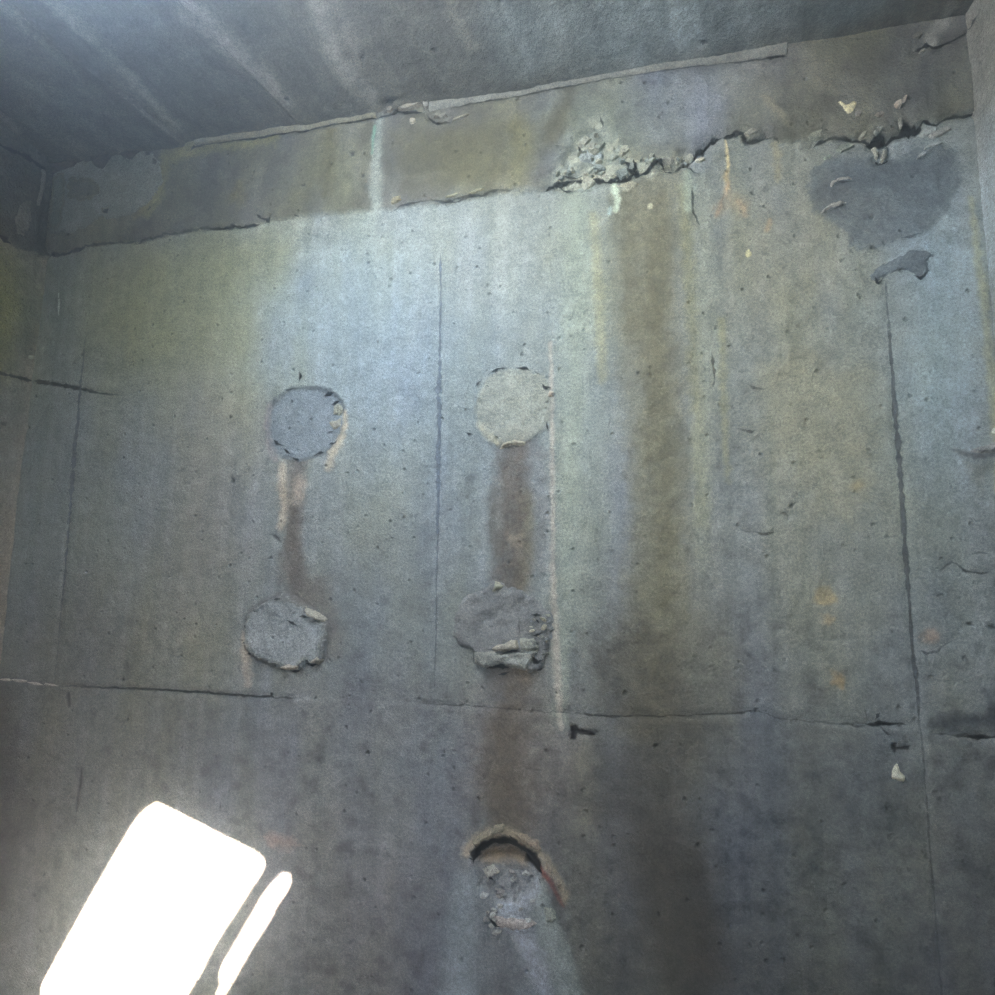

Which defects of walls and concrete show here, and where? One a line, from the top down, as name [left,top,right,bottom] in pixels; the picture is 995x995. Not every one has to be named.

spalling [535,111,696,197]
crack [664,128,779,225]
water stain [805,141,968,255]
crack [808,95,973,166]
crack [0,351,117,659]
water stain [457,130,899,995]